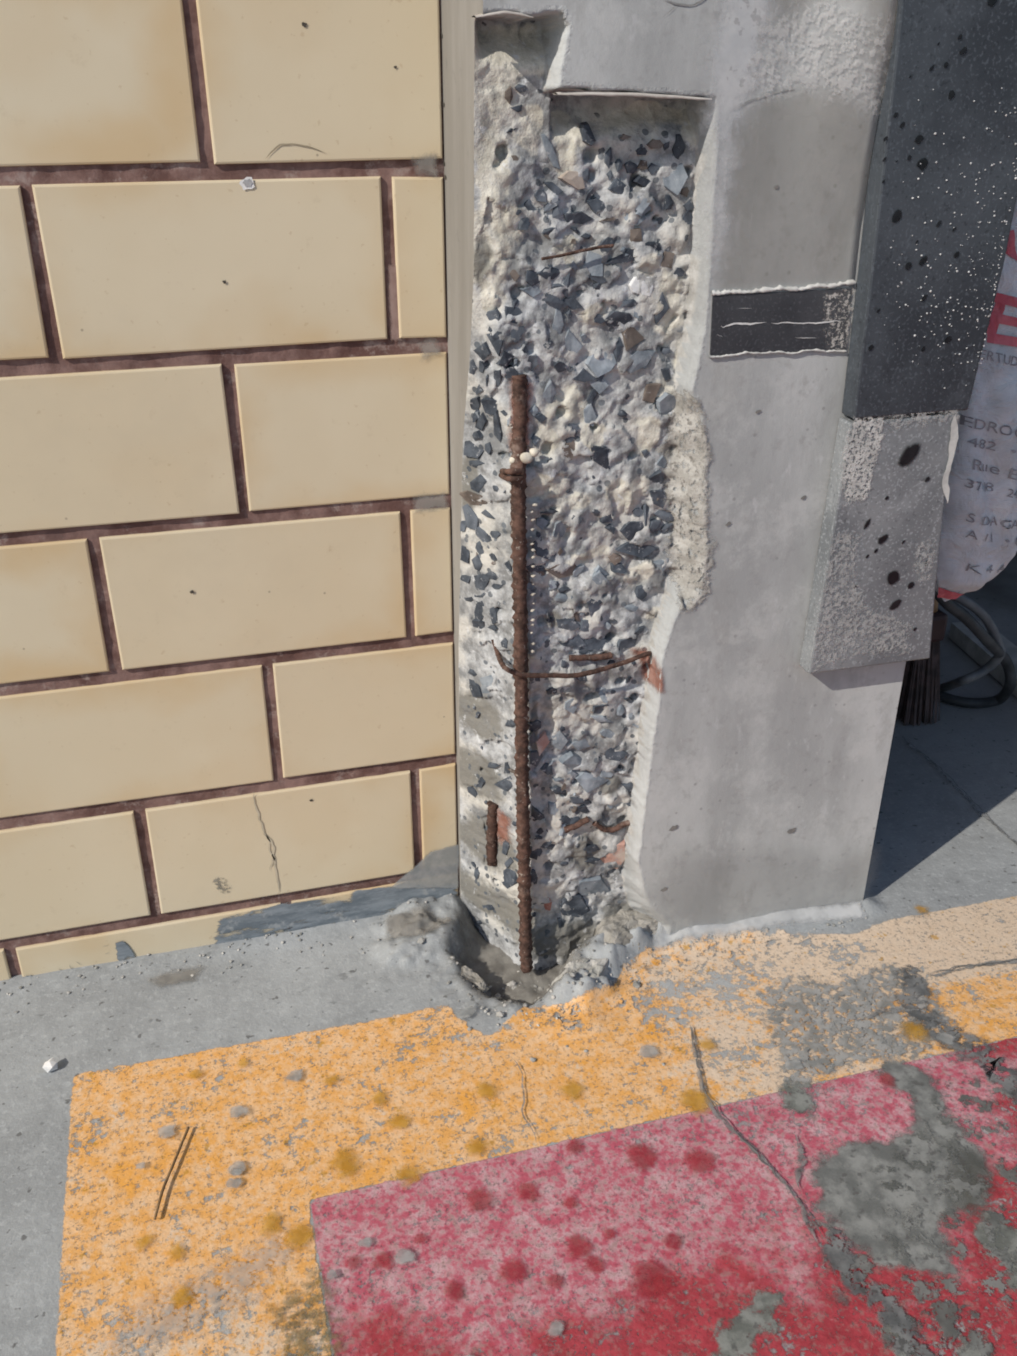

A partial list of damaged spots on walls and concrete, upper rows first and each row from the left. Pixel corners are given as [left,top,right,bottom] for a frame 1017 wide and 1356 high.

spalling [459,4,731,986]
corrosion [485,374,533,974]
corrosion [633,649,663,692]
crack [253,795,279,894]
crack [902,736,1017,845]
spalling [461,966,491,997]
crack [859,958,1017,1105]
peeling [755,962,1017,1356]
peeling [711,1290,784,1356]